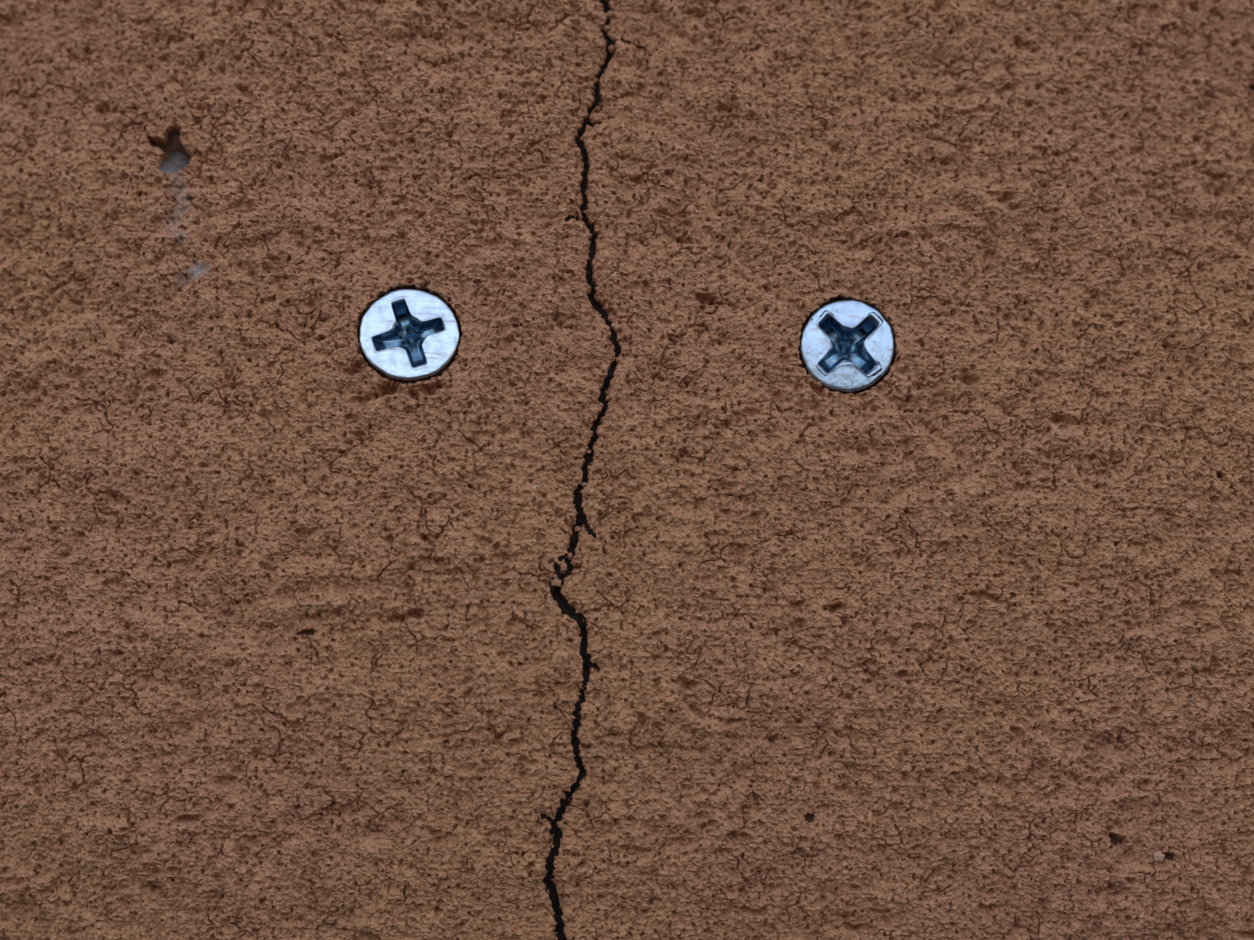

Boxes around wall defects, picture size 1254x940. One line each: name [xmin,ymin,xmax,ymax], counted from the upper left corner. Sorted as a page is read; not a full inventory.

spalling [151,130,192,174]
crack [541,0,643,940]